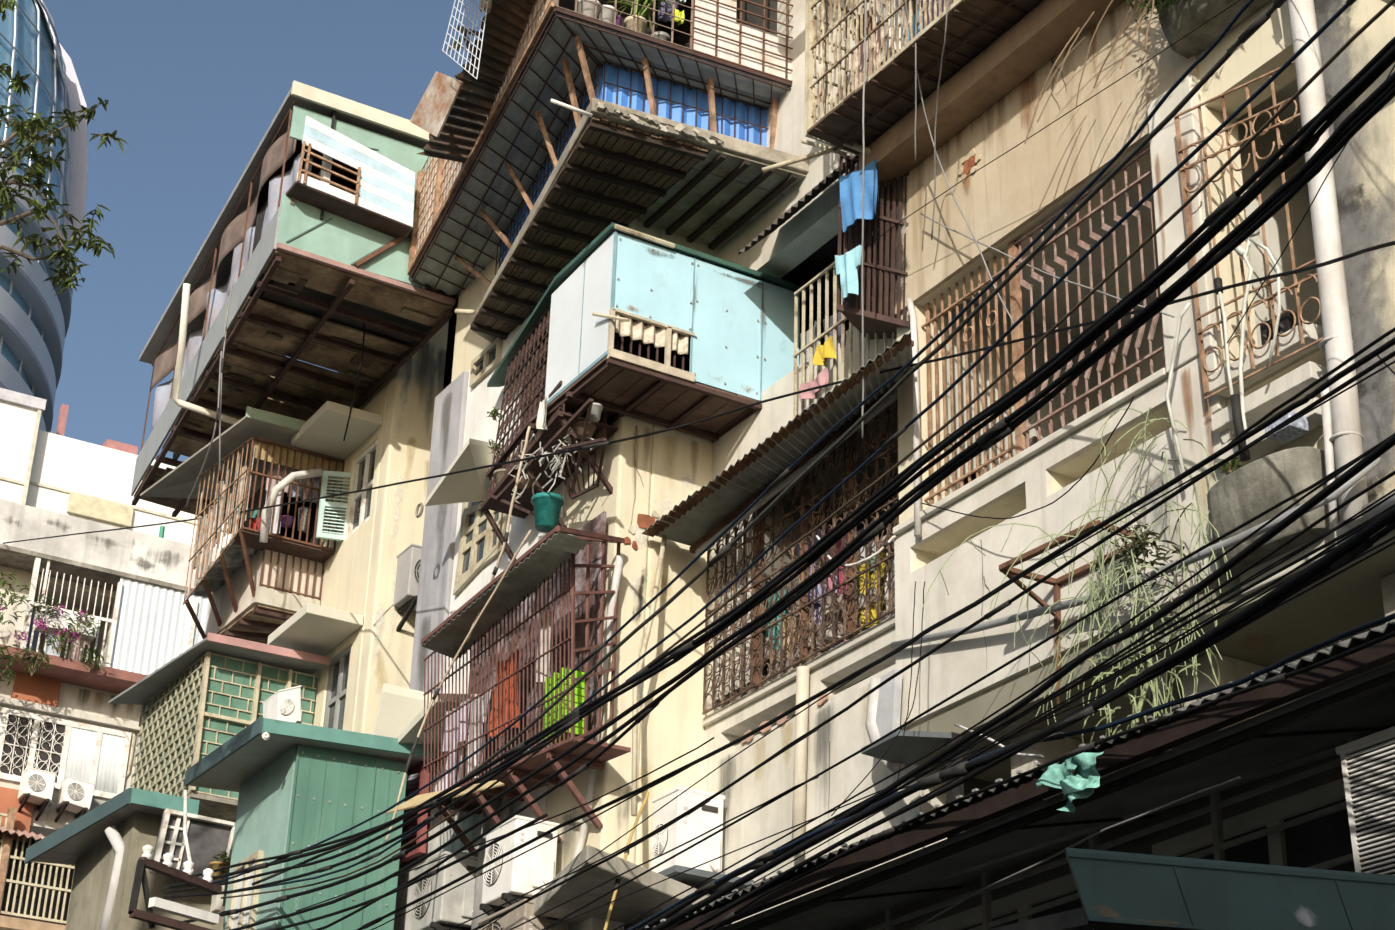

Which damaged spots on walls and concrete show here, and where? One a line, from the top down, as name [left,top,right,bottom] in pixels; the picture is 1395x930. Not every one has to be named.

leakage [1314,0,1350,104]
leakage [1329,104,1352,136]
leakage [1332,128,1395,501]